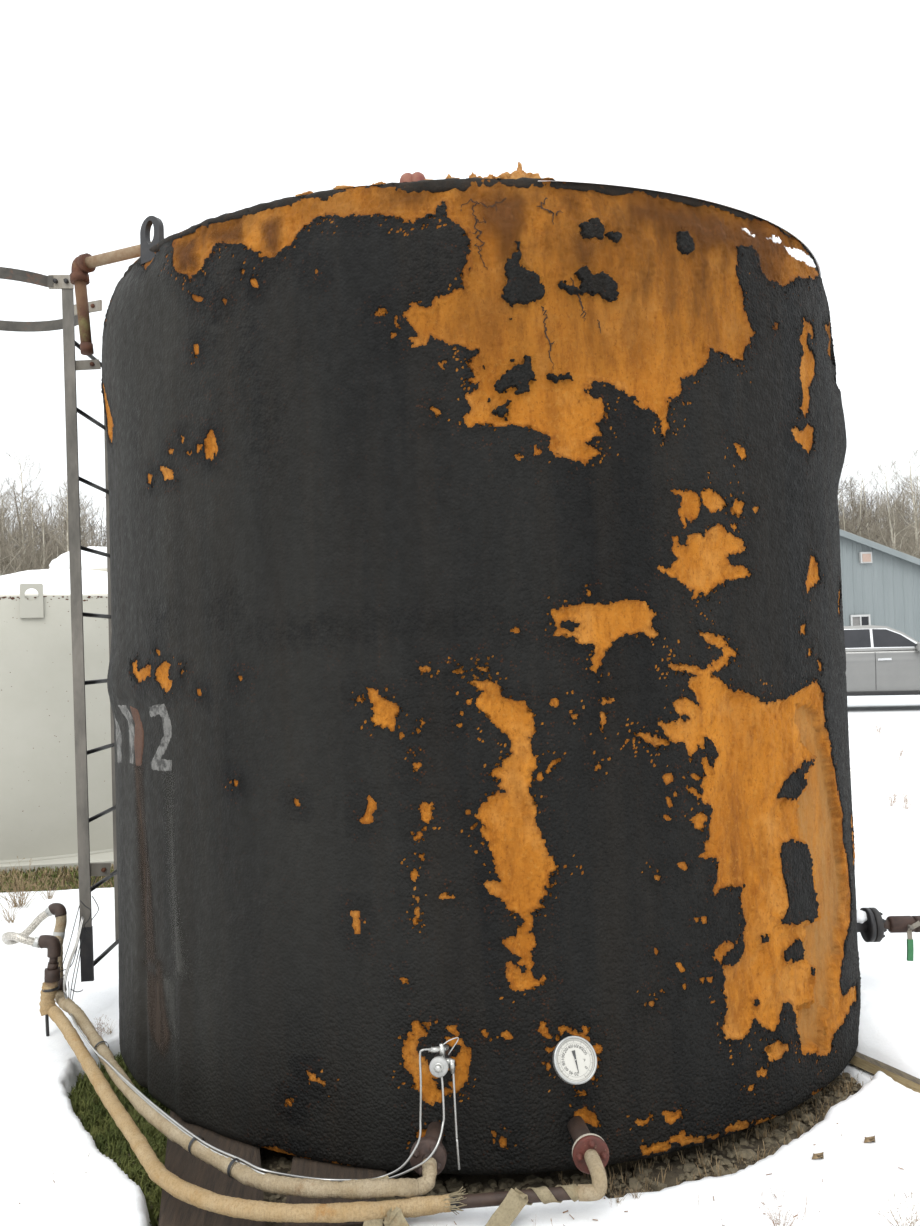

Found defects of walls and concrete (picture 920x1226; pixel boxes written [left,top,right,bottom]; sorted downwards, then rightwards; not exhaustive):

peeling [142,178,819,467]
peeling [791,317,831,453]
peeling [148,430,218,489]
peeling [132,649,187,694]
peeling [352,687,425,772]
peeling [545,472,856,1095]
peeling [419,655,584,1003]
peeling [392,1020,476,1106]
peeling [481,1029,513,1041]
peeling [538,1021,603,1127]
peeling [627,1105,776,1156]